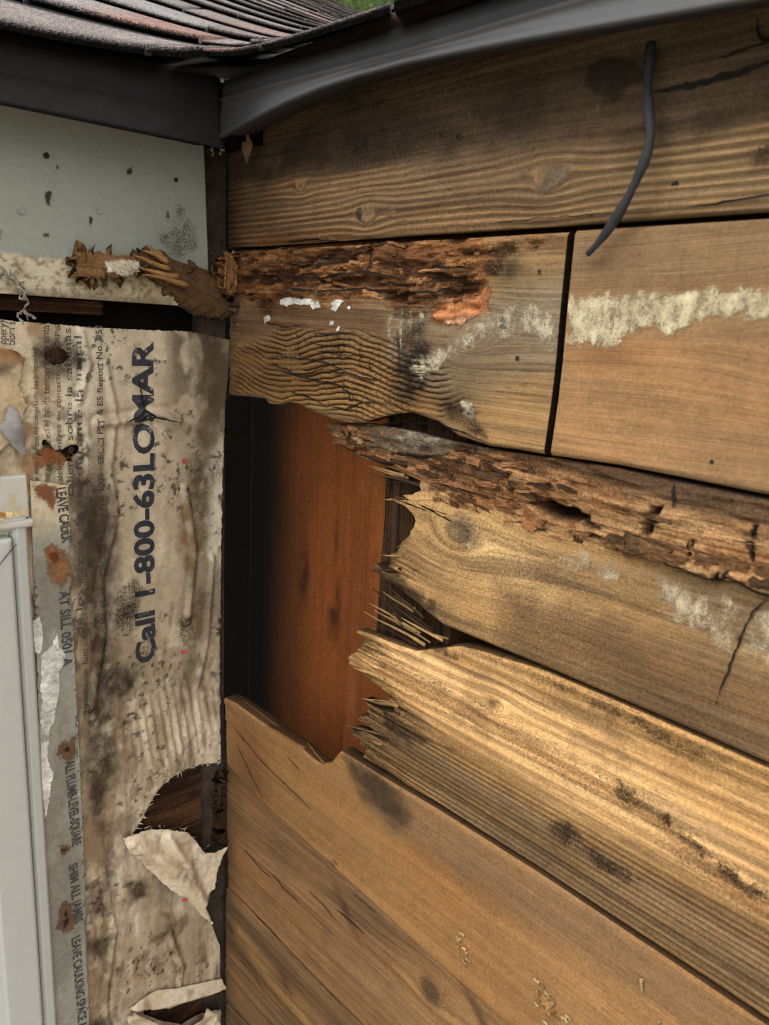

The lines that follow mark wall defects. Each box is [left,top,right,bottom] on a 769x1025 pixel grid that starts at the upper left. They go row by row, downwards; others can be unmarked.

crack [656,18,769,92]
peeling [105,259,140,276]
peeling [238,245,381,331]
peeling [394,244,480,325]
damp [180,358,219,576]
peeling [347,425,674,567]
crack [669,483,677,508]
damp [90,495,142,695]
damp [178,600,203,646]
crack [664,524,769,705]
peeling [690,552,769,591]
damp [88,698,130,801]